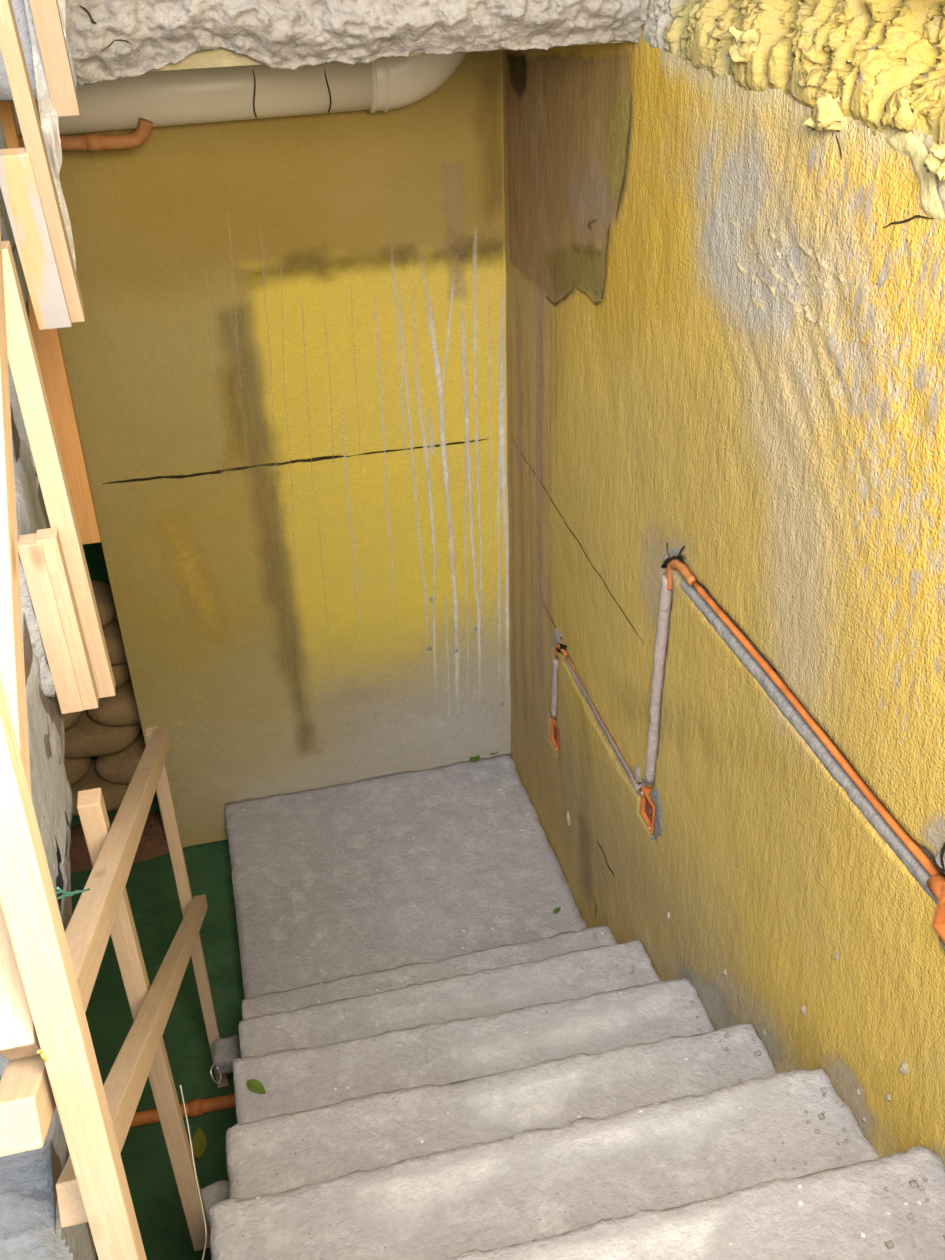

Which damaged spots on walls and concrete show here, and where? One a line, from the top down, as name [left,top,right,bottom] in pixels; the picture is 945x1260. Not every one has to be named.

spalling [65,0,945,305]
crack [103,437,642,641]
leakage [389,288,542,740]
peeling [918,367,937,418]